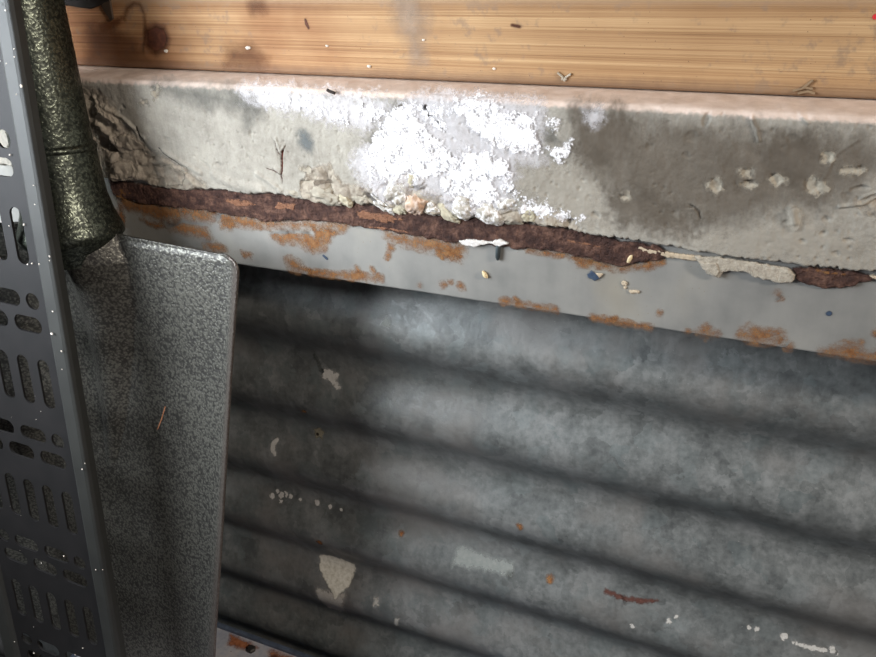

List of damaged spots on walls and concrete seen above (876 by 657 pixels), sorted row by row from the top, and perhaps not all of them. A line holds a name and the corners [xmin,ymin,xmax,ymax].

spalling [82,87,207,191]
damp [178,83,873,236]
spalling [299,164,455,215]
rust [109,180,666,271]
spalling [498,209,578,231]
peeling [638,247,795,283]
rust [792,266,872,289]
rust [604,589,658,604]